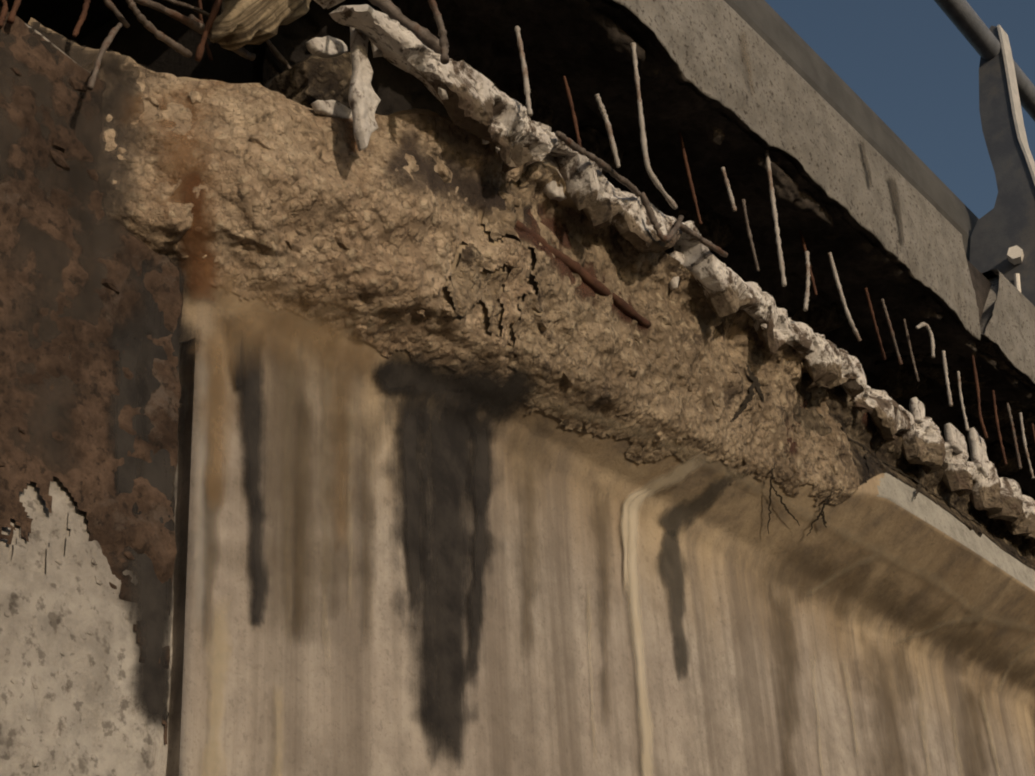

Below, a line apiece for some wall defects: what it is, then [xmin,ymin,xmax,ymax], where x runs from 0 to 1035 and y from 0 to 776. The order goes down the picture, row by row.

rust [184,174,212,295]
rust [514,197,645,328]
spalling [630,42,678,210]
spalling [678,132,703,225]
leakage [228,315,268,623]
spalling [0,0,641,776]
leakage [375,354,535,760]
leakage [660,476,730,676]
crack [732,365,764,421]
spalling [482,148,1035,569]
crack [767,463,833,536]